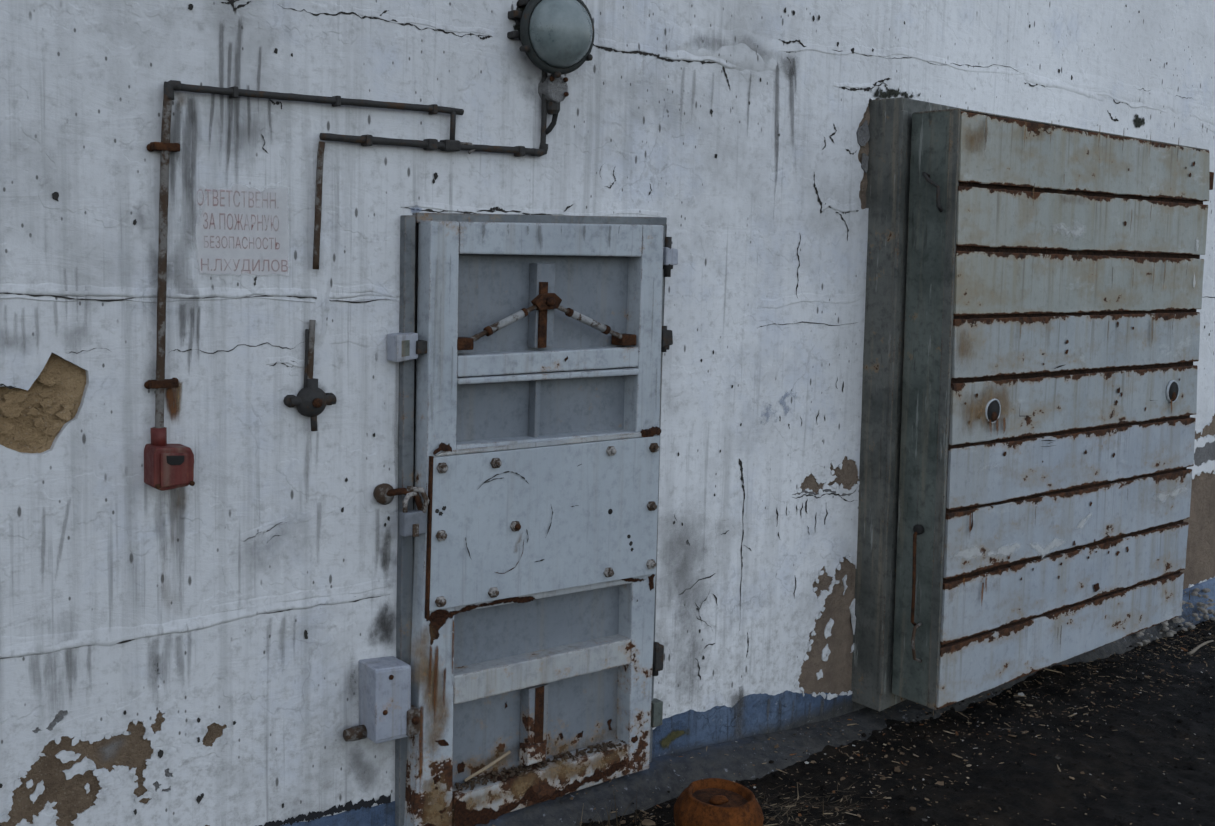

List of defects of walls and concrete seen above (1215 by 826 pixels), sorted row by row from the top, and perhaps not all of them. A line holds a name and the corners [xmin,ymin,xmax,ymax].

crack [593,38,1045,91]
crack [1095,88,1215,126]
spalling [0,353,86,453]
peeling [1194,414,1215,445]
peeling [776,455,860,539]
flaking render [1180,470,1215,589]
flaking render [794,554,856,700]
peeling [0,710,173,826]
rust [417,731,638,826]